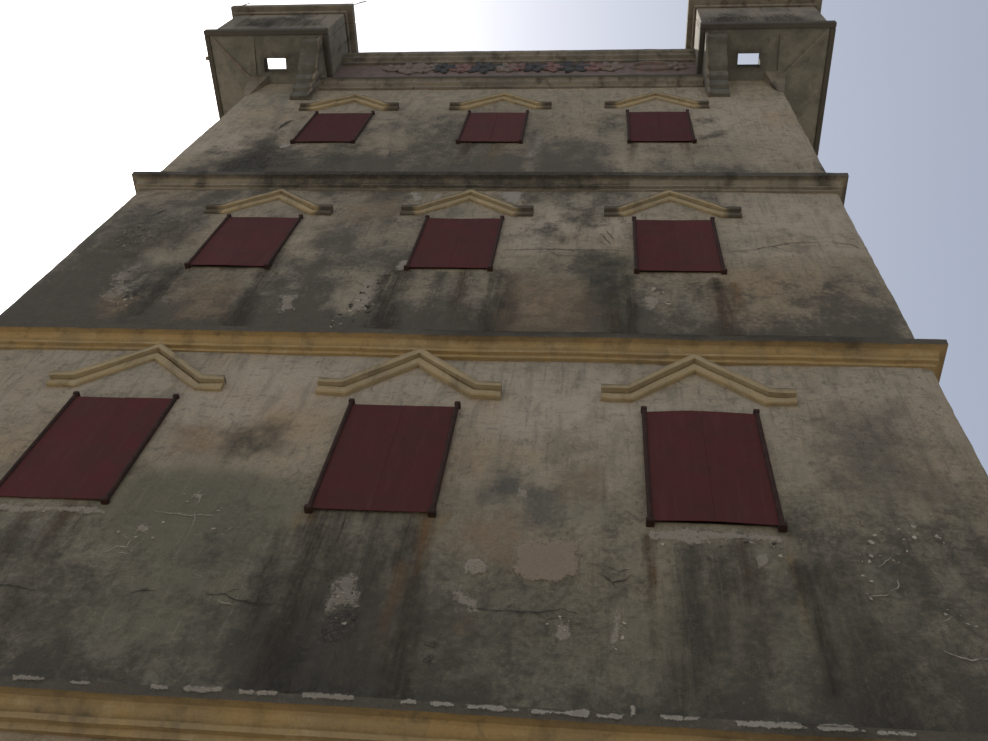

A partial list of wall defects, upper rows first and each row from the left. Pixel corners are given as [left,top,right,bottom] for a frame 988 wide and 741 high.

damp [228,142,610,204]
spalling [319,573,361,642]
peeling [184,685,223,693]
peeling [302,692,354,700]
peeling [467,704,519,712]
peeling [531,705,635,719]
peeling [735,720,917,737]